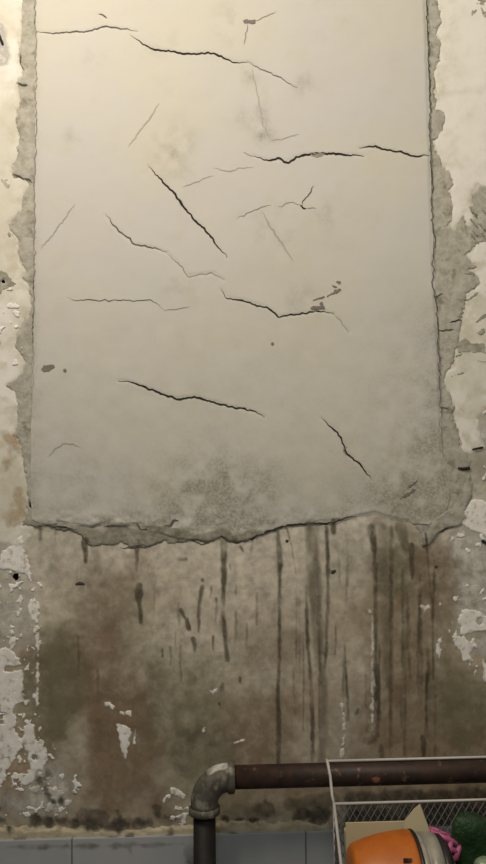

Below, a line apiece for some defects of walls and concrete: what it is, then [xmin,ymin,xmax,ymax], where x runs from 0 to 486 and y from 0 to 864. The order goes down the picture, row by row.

crack [13,0,461,455]
spalling [426,0,486,511]
spalling [0,0,82,818]
water stain [179,578,204,646]
water stain [215,552,226,600]
water stain [305,519,336,688]
crack [323,419,371,478]
water stain [369,524,447,736]
peeling [435,584,486,682]
peeling [446,499,486,553]
water stain [31,624,163,838]
water stain [343,788,486,828]